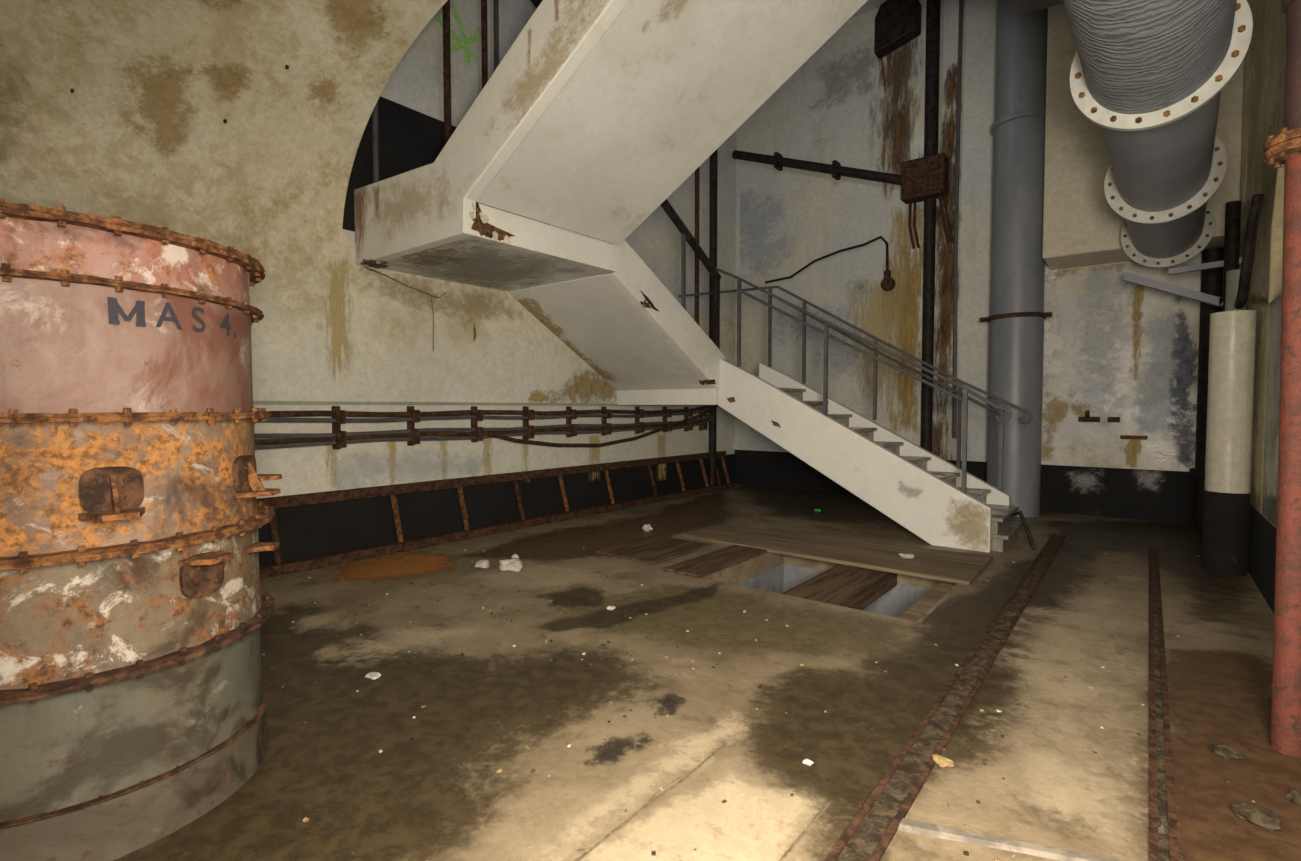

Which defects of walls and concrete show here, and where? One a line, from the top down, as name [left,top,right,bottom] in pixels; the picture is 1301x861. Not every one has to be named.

leakage [137,58,195,151]
leakage [328,0,384,50]
corrosion [874,38,920,194]
spalling [469,202,514,244]
corrosion [849,62,959,464]
corrosion [1125,439,1141,467]
corrosion [1130,285,1144,379]
leakage [1169,297,1199,467]
leakage [112,605,684,861]
leakage [523,560,1034,861]
leakage [928,521,1245,777]
leakage [1166,650,1301,861]